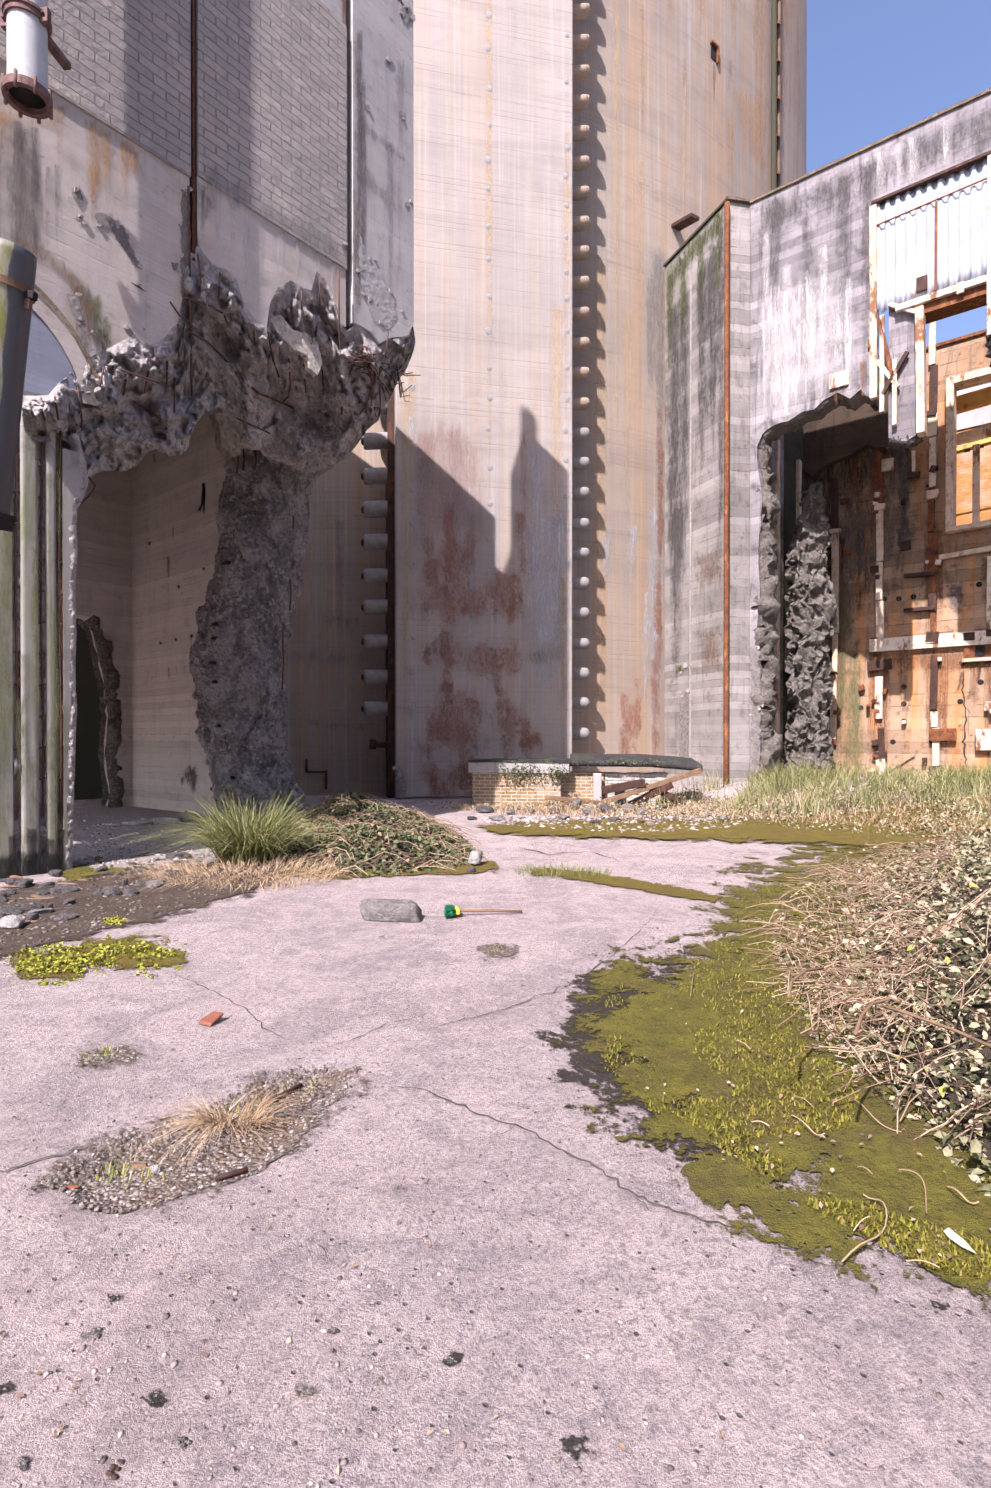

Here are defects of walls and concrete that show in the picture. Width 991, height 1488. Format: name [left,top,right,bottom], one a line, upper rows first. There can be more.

leakage [1,123,107,341]
leakage [762,112,991,405]
spalling [13,450,21,819]
spalling [22,186,421,869]
corrosion [424,632,539,794]
leakage [626,161,724,683]
spalling [749,391,879,780]
crack [0,1140,101,1172]
crack [385,1086,853,1275]